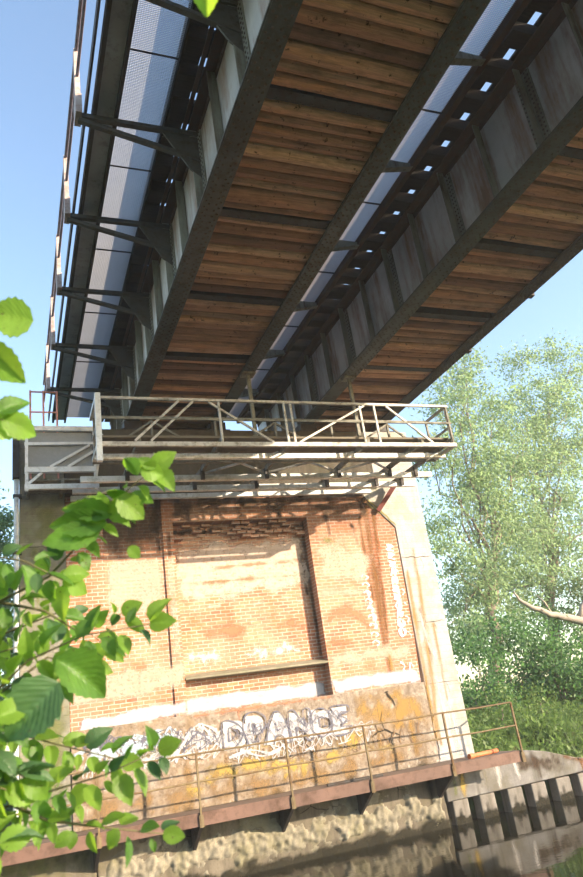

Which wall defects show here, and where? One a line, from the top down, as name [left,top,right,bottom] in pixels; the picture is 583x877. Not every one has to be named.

peeling [109,561,161,614]
peeling [171,520,308,607]
corrosion [358,571,442,745]
crack [372,713,402,746]
water stain [185,814,473,877]